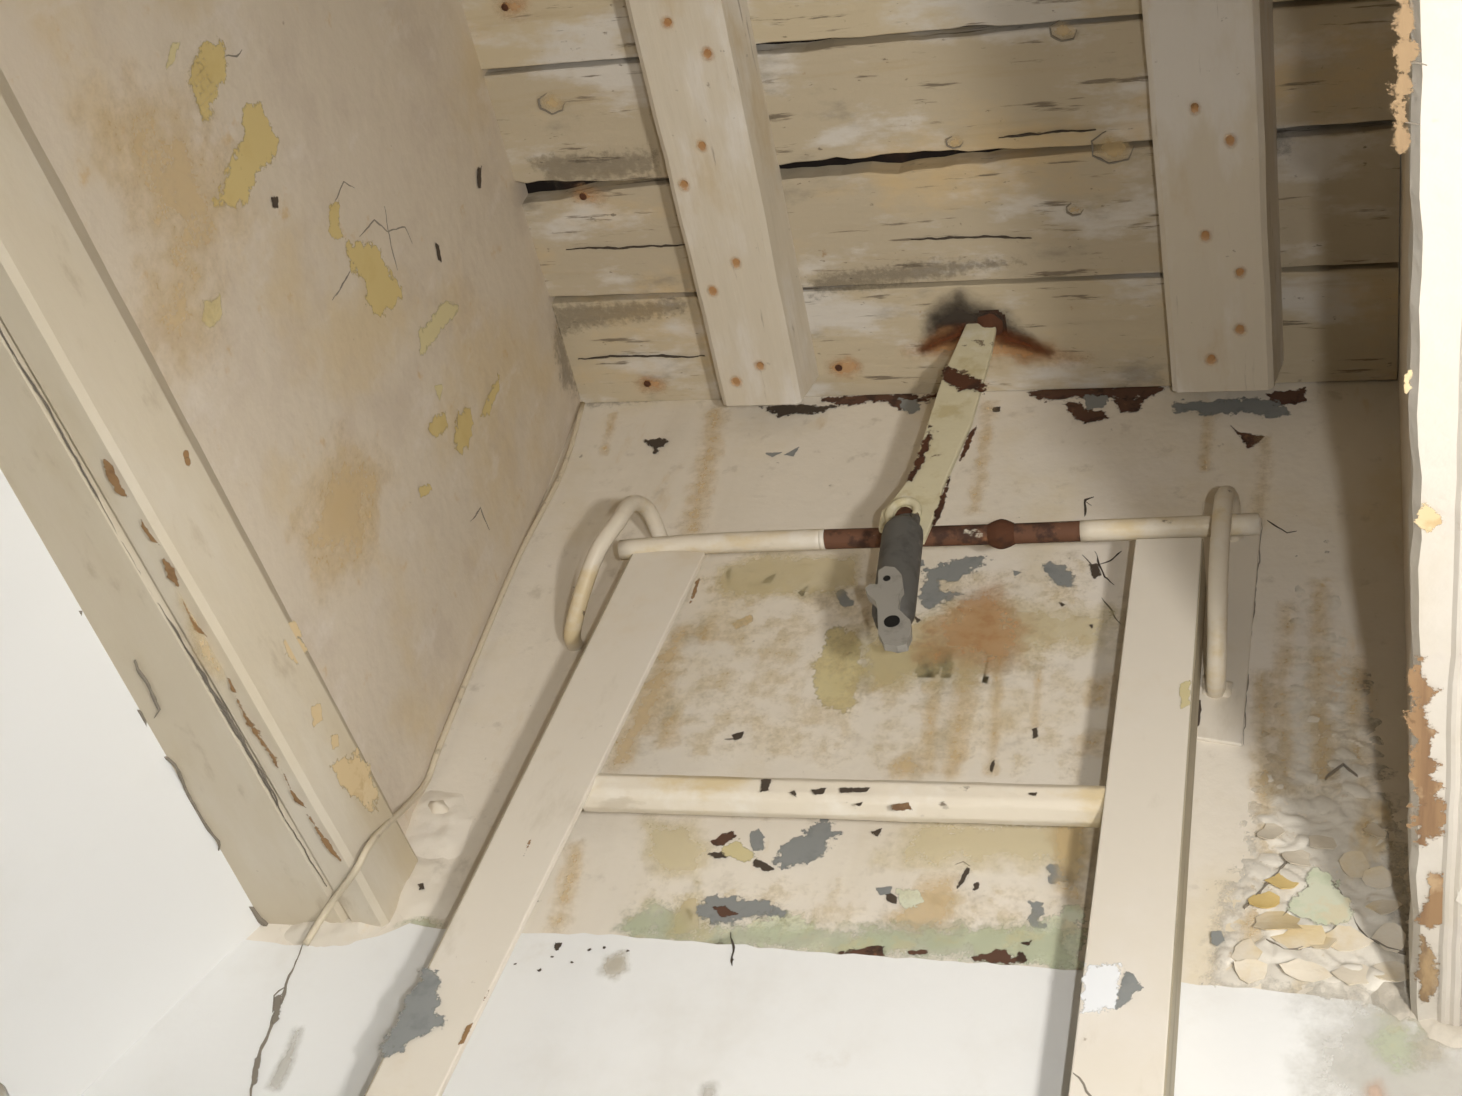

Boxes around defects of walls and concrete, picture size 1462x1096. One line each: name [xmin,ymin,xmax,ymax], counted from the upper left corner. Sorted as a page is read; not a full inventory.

corrosion [920,295,1051,395]
peeling [1404,370,1413,394]
corrosion [932,476,950,528]
peeling [915,556,992,623]
peeling [1042,561,1101,606]
peeling [1207,583,1462,1007]
peeling [708,819,843,871]
peeling [955,861,979,891]
crack [249,906,268,926]
peeling [624,894,818,961]
peeling [891,900,1088,970]
crack [250,945,303,1096]